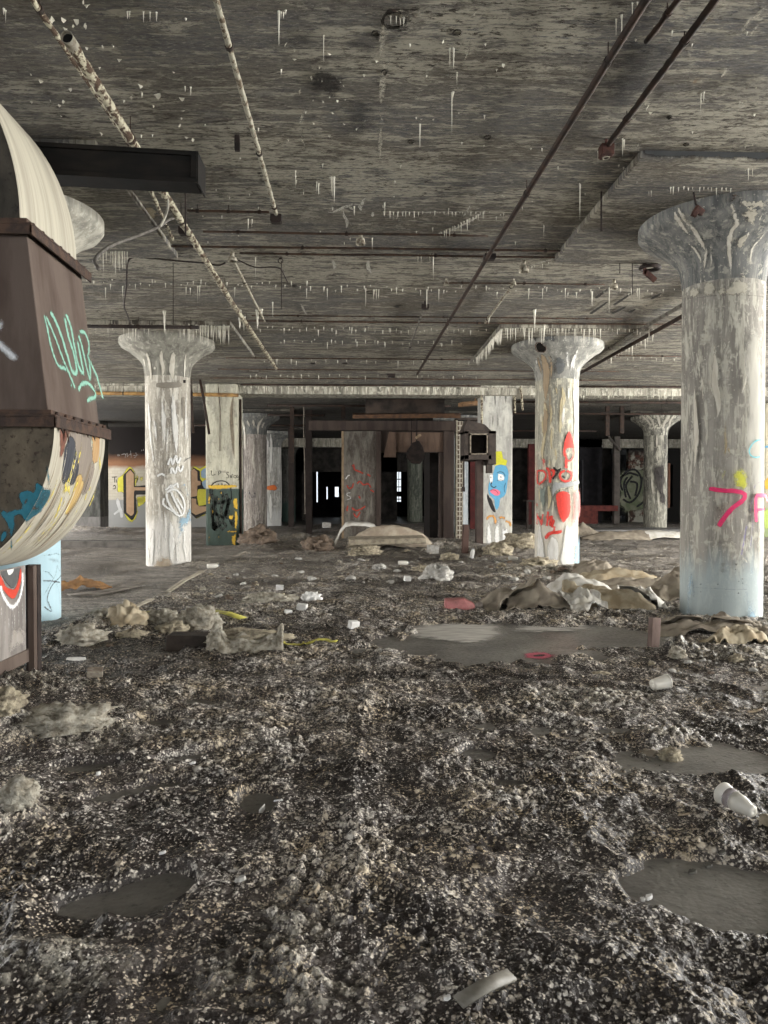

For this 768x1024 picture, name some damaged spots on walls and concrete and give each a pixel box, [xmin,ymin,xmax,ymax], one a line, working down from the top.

peeling [737,201,768,248]
peeling [689,273,748,298]
spalling [156,382,185,419]